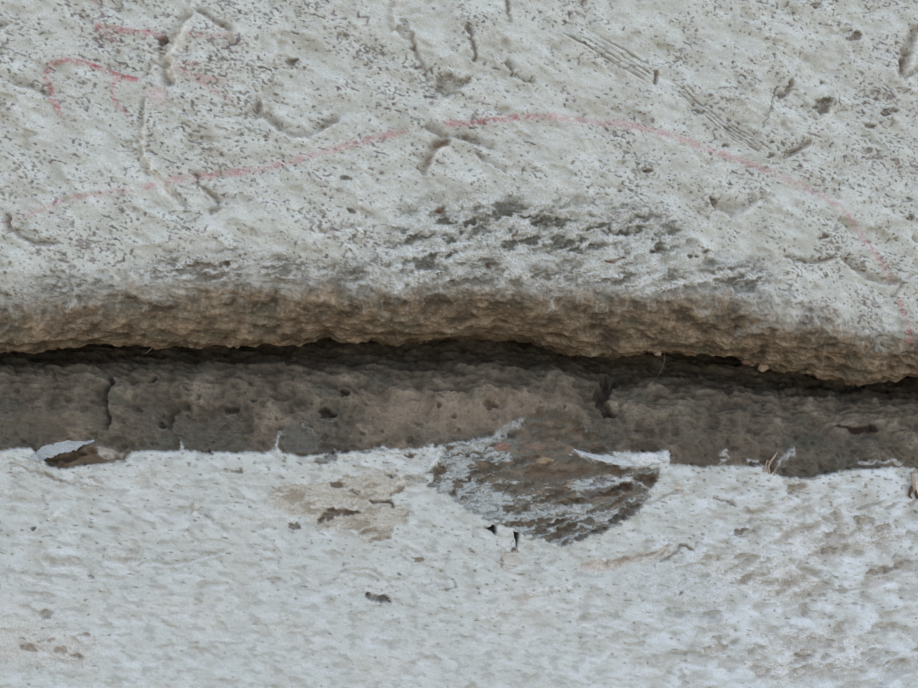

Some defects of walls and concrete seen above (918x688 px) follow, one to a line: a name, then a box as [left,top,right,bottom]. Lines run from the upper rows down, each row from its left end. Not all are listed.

spalling [588,375,622,422]
peeling [27,440,130,475]
spalling [219,467,249,478]
spalling [269,405,690,549]
spalling [770,445,839,500]